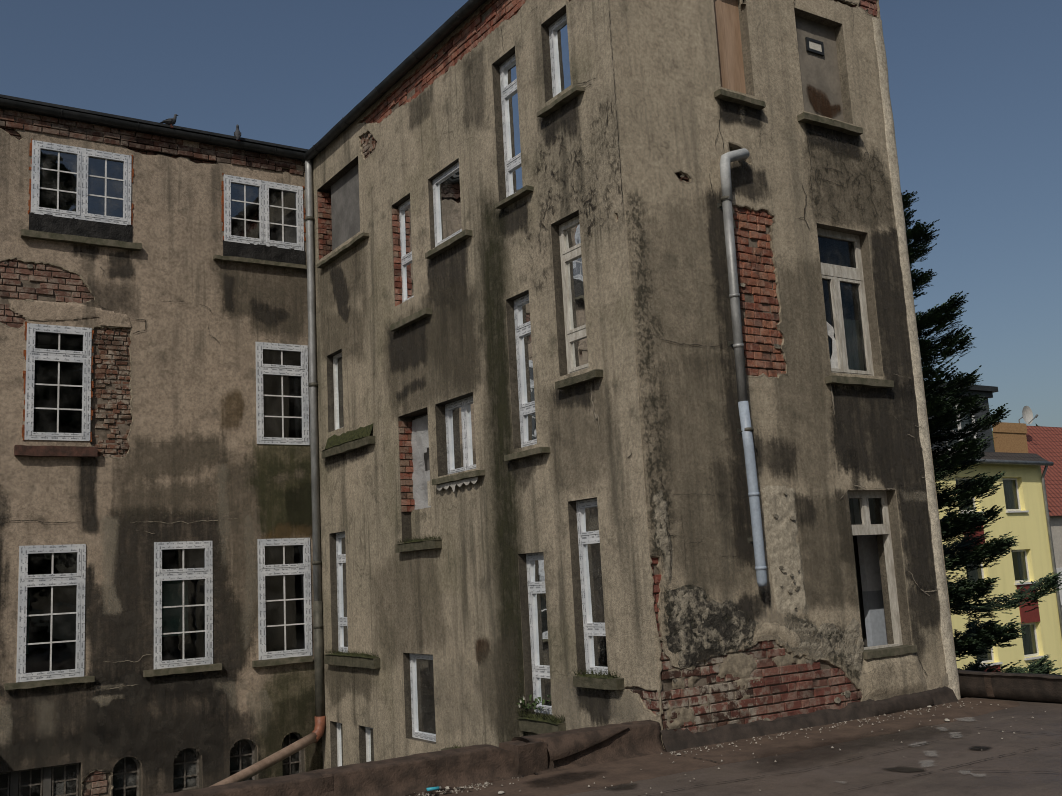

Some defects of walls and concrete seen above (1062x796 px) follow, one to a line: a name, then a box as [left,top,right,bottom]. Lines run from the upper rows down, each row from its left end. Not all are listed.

spalling [358,0,526,161]
damp [805,123,861,160]
spalling [828,0,880,18]
spalling [0,257,97,331]
spalling [732,203,788,381]
flaking render [90,325,134,459]
damp [795,228,941,654]
damp [0,436,312,796]
spalling [624,490,865,755]